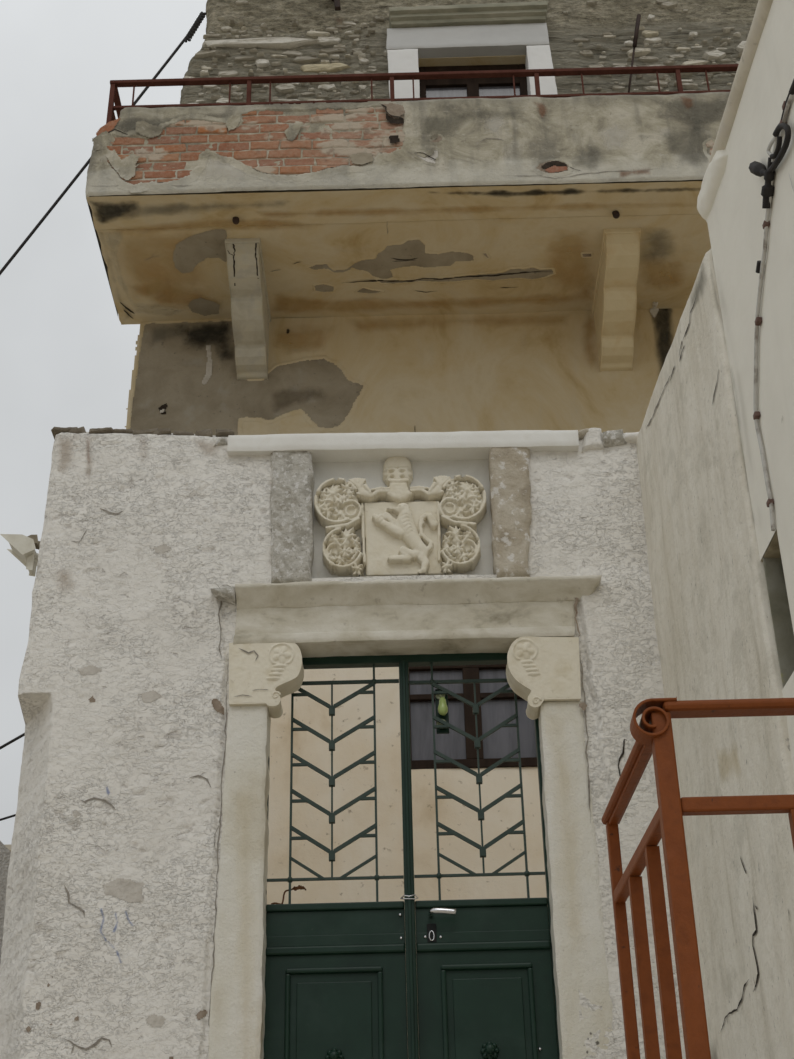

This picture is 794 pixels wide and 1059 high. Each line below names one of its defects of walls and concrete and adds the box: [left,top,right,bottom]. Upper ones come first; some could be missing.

flaking render [92,101,442,193]
spalling [530,158,580,177]
peeling [173,229,227,273]
peeling [304,236,478,294]
damp [186,321,231,357]
peeling [125,298,369,436]
damp [650,302,672,367]
crack [574,598,591,823]
crack [618,739,626,776]
crack [721,903,759,1030]